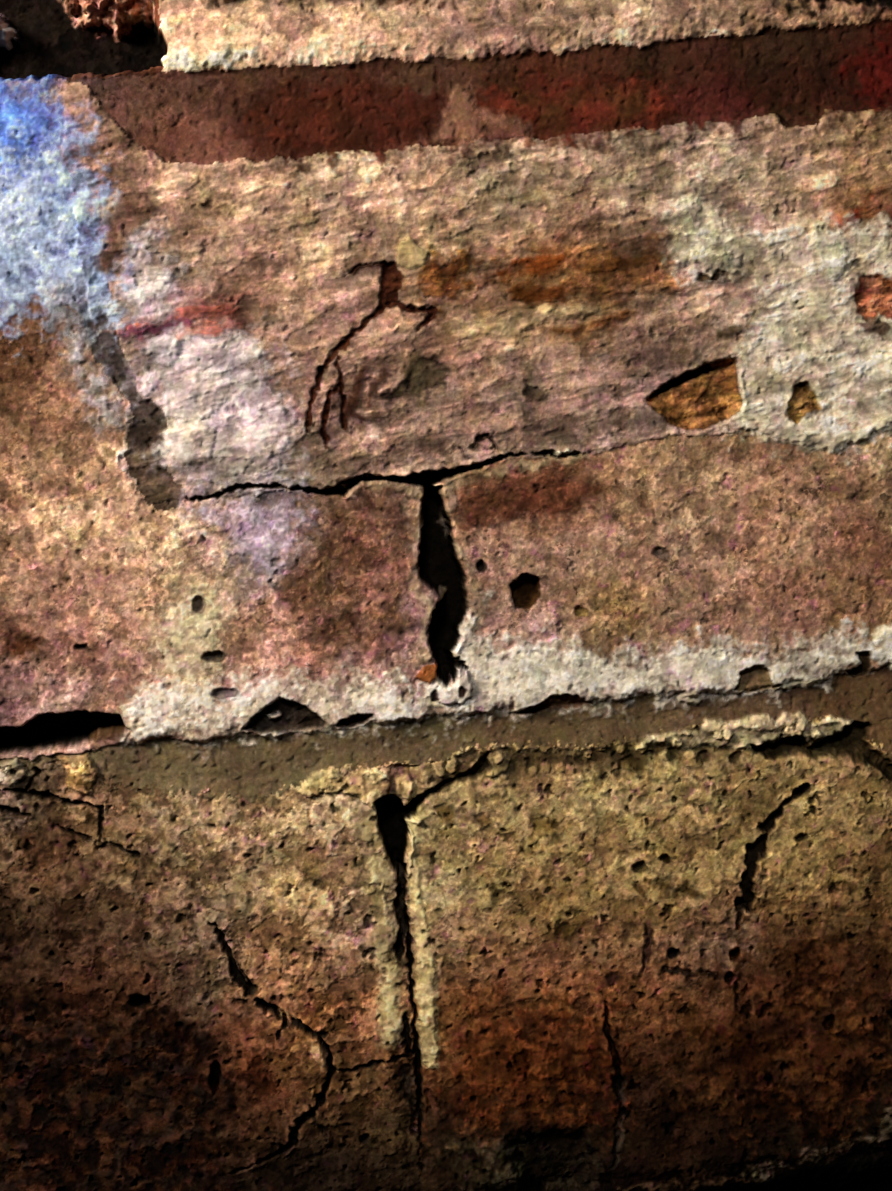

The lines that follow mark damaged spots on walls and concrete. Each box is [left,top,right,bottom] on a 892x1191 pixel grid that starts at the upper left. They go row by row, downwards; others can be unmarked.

crack [305,261,437,449]
corrosion [416,232,682,341]
spalling [647,358,742,429]
spalling [786,382,821,424]
spalling [855,274,892,334]
crack [187,449,581,686]
water stain [120,454,887,745]
crack [0,754,140,858]
crack [209,753,493,1171]
crack [603,783,811,1167]